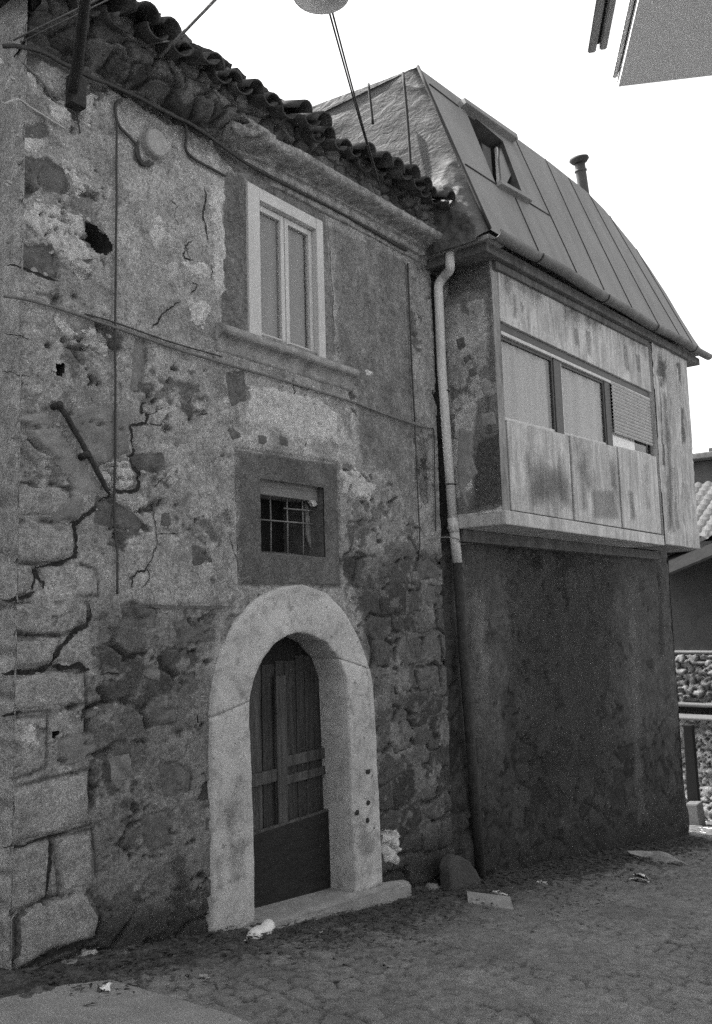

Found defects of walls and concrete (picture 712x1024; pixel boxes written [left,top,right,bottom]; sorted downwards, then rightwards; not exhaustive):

peeling [3,93,119,281]
crack [152,191,214,333]
water stain [657,361,685,440]
crack [1,401,177,603]
crack [1,602,120,677]